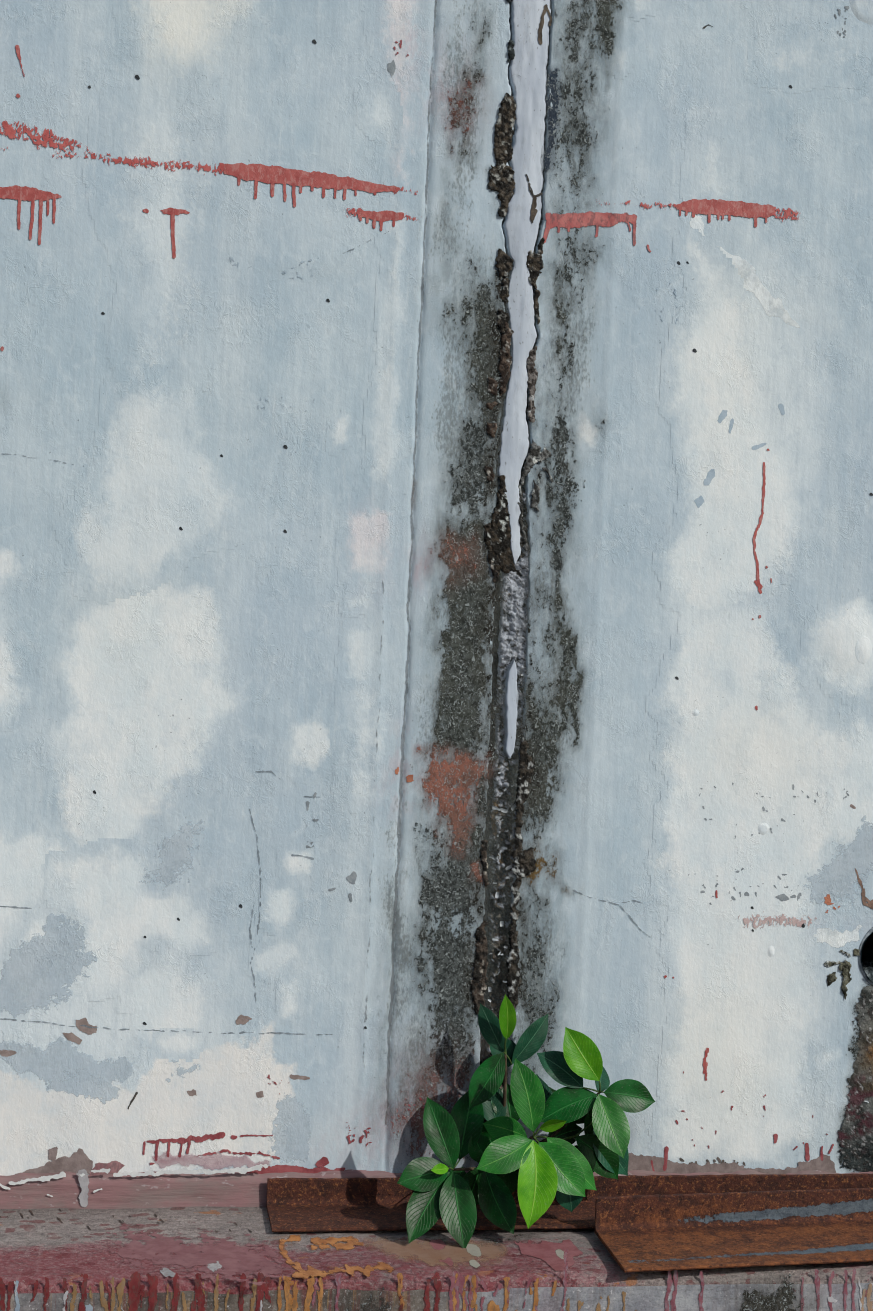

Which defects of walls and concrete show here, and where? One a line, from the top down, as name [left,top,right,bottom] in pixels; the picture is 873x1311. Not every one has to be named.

leakage [444,57,486,155]
spalling [487,93,516,217]
crack [525,174,543,197]
peeling [0,0,345,1193]
spalling [274,440,553,1019]
crack [480,574,500,1065]
leakage [394,228,605,1160]
peeling [628,117,873,1174]
leakage [837,984,873,1173]
rust [70,1277,129,1311]
rust [277,1235,636,1311]
leakage [736,1268,869,1311]